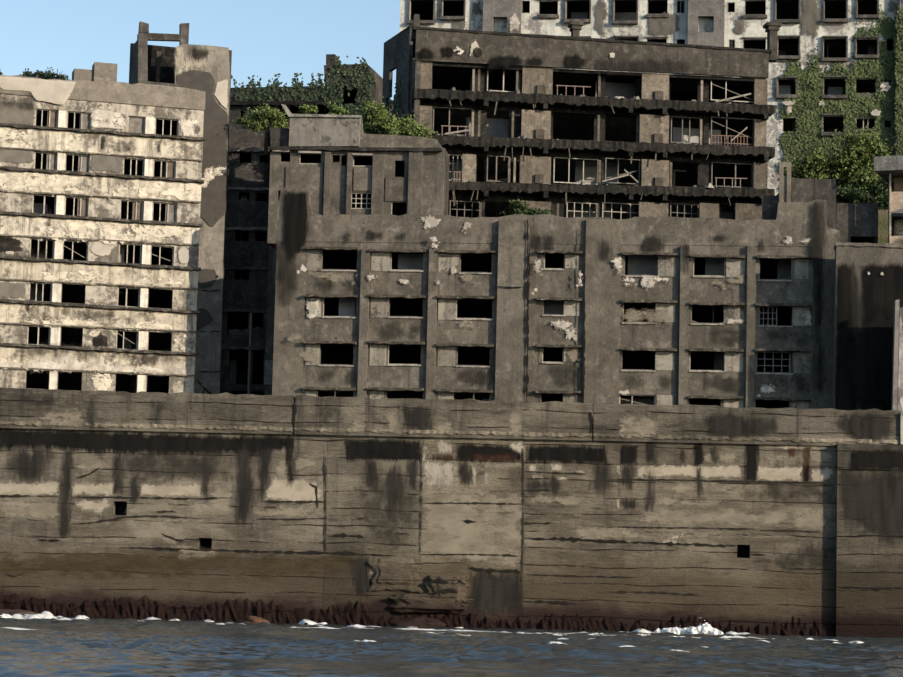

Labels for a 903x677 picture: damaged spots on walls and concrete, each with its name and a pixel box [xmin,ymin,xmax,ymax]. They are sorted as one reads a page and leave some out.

peeling [0,76,85,197]
peeling [40,216,190,264]
damp [276,191,309,303]
spalling [551,319,580,367]
spalling [611,255,669,290]
damp [767,201,826,391]
crack [0,492,53,500]
damp [0,402,294,535]
crack [291,402,299,433]
crack [76,450,822,605]
crack [793,567,903,589]
damp [835,264,903,541]